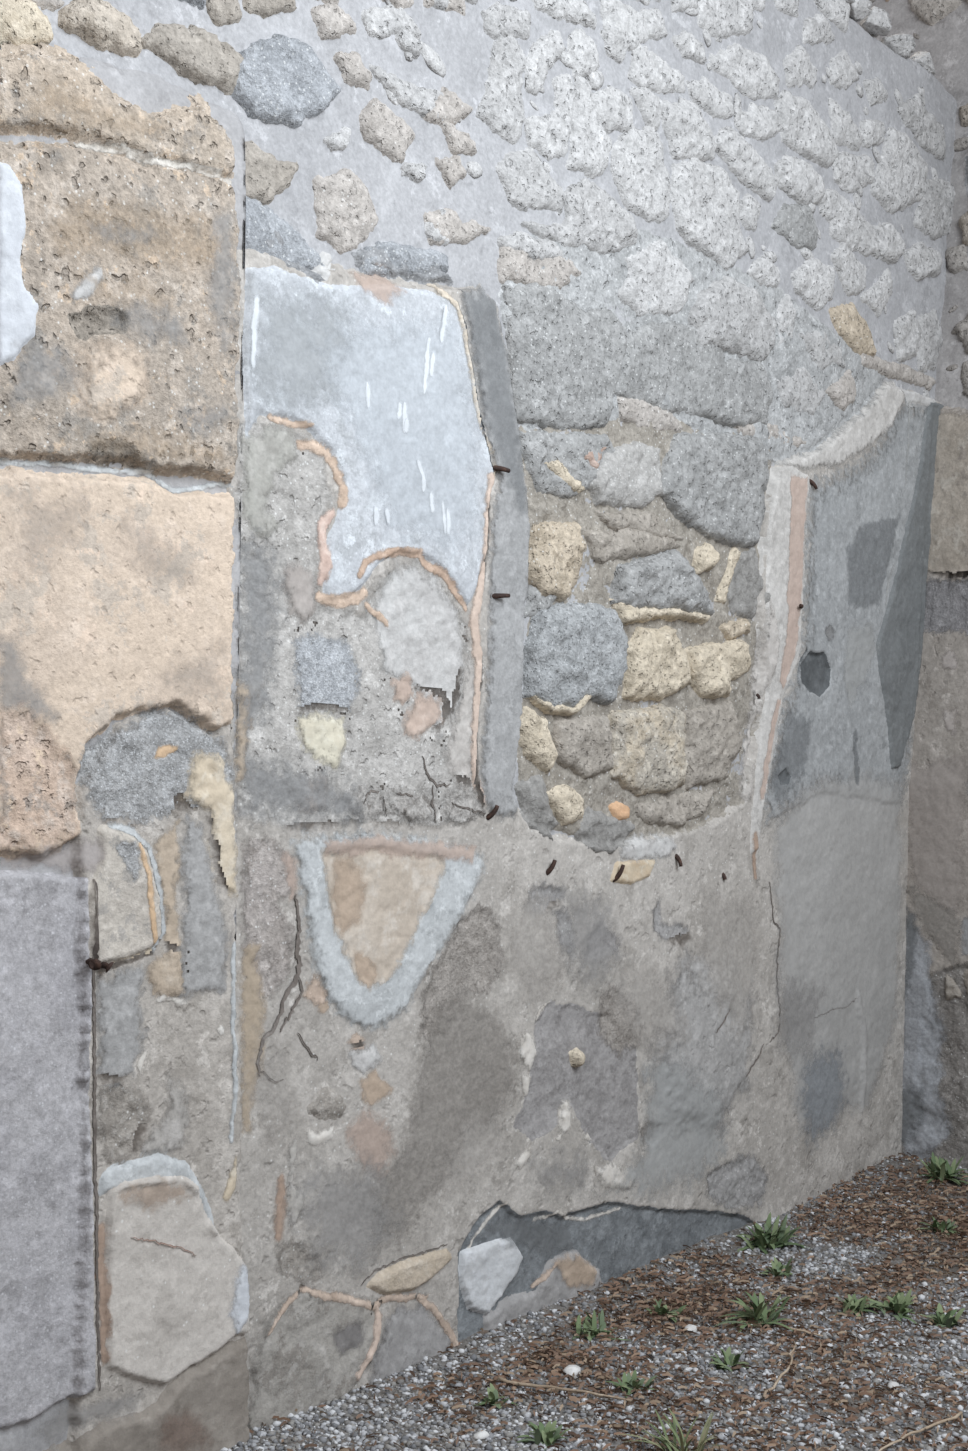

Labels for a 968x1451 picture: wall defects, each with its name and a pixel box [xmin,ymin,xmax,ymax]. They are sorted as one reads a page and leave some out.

spalling [404,42,446,78]
spalling [559,51,604,90]
spalling [514,380,936,885]
spalling [924,578,968,635]
crack [256,894,318,1083]
spalling [904,962,968,1169]
spalling [366,986,752,1343]